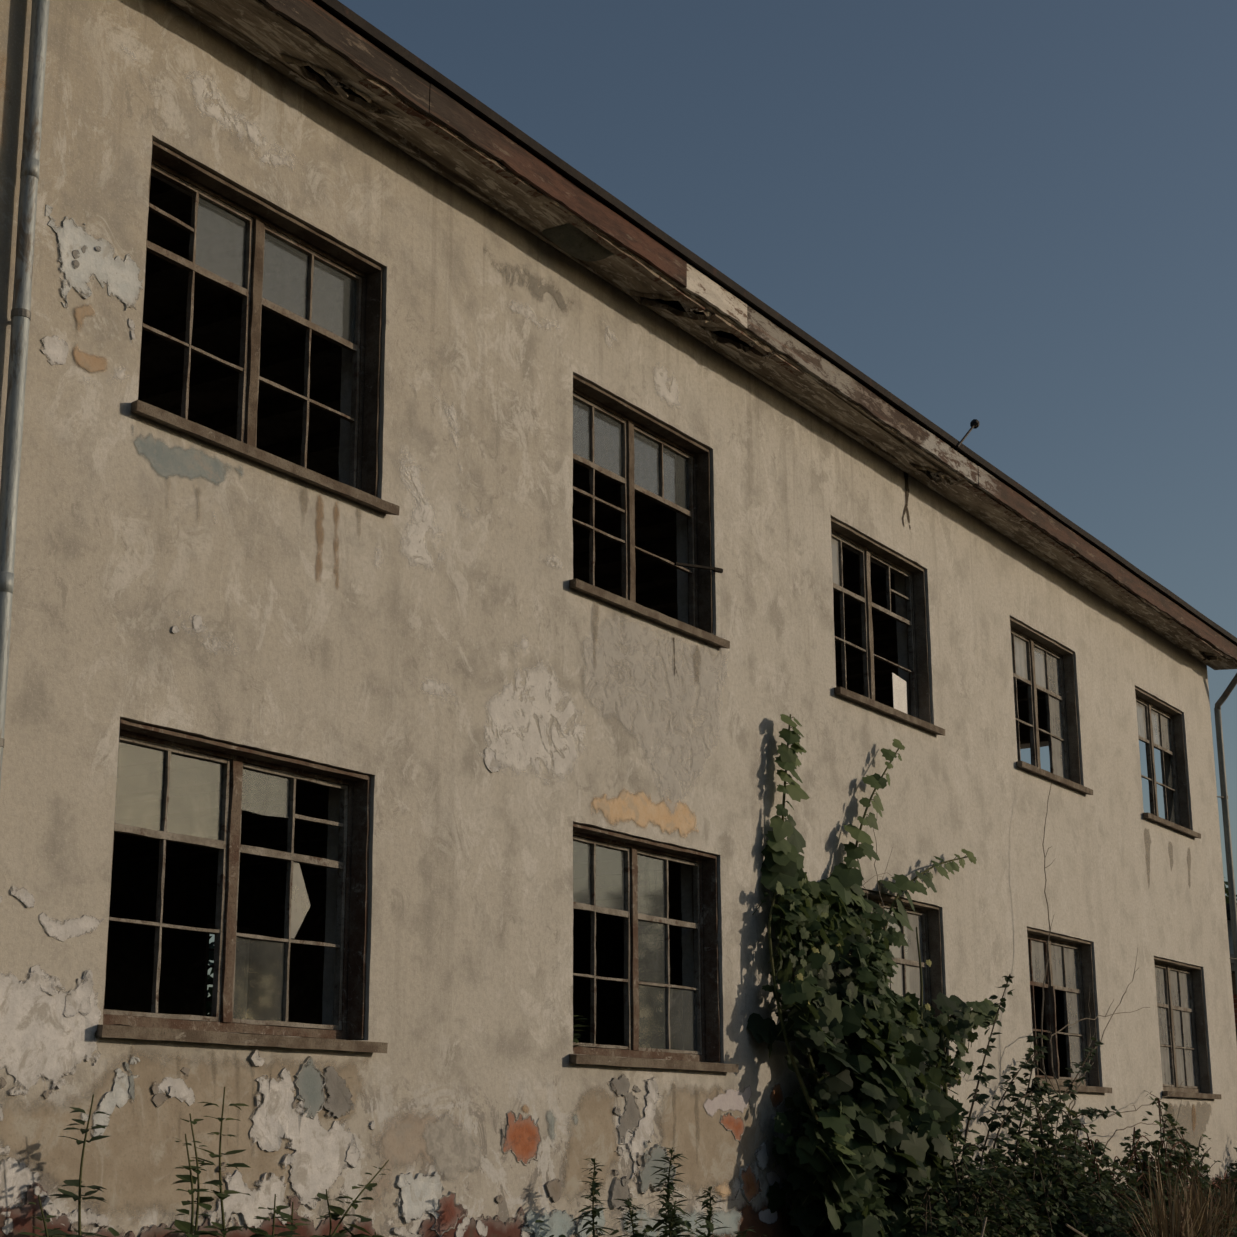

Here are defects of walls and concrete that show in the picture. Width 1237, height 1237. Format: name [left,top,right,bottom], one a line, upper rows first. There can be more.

peeling [45,204,144,340]
peeling [501,265,567,329]
peeling [40,335,125,379]
damp [132,427,243,484]
peeling [483,663,586,779]
flaking render [591,789,696,836]
peeling [0,886,104,942]
peeling [0,965,794,1237]